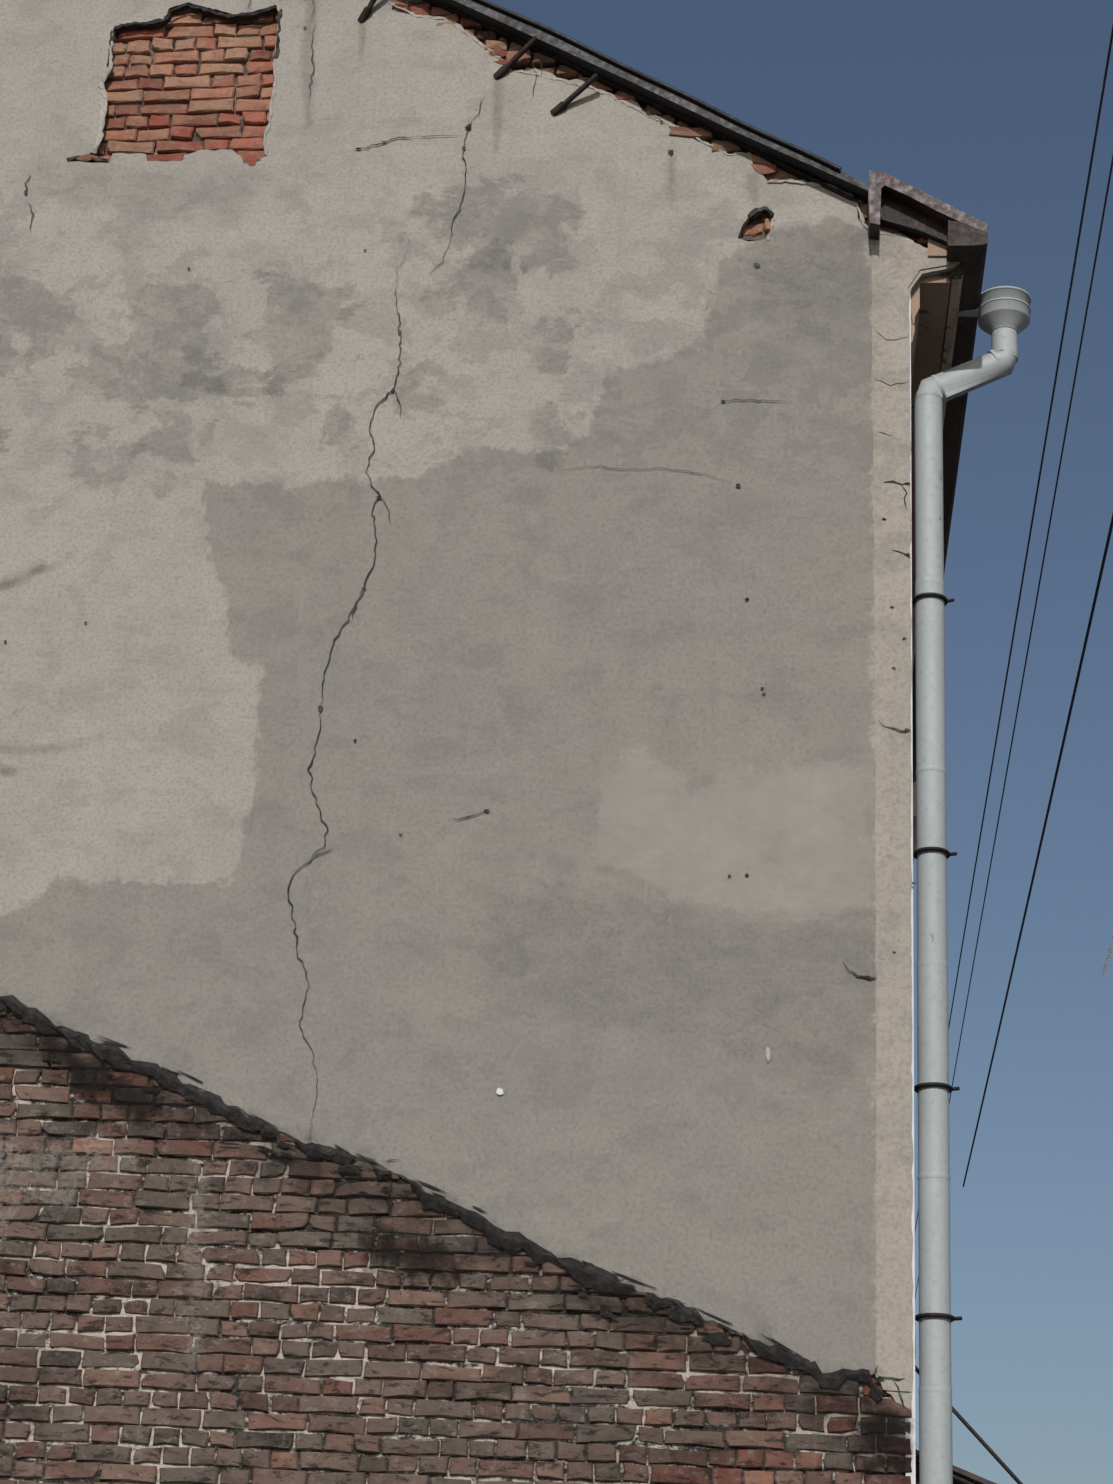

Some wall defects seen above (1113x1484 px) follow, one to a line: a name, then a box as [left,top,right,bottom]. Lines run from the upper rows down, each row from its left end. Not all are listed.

spalling [66,4,282,165]
spalling [386,0,679,127]
spalling [695,137,928,245]
crack [562,465,741,487]
crack [287,98,483,1162]